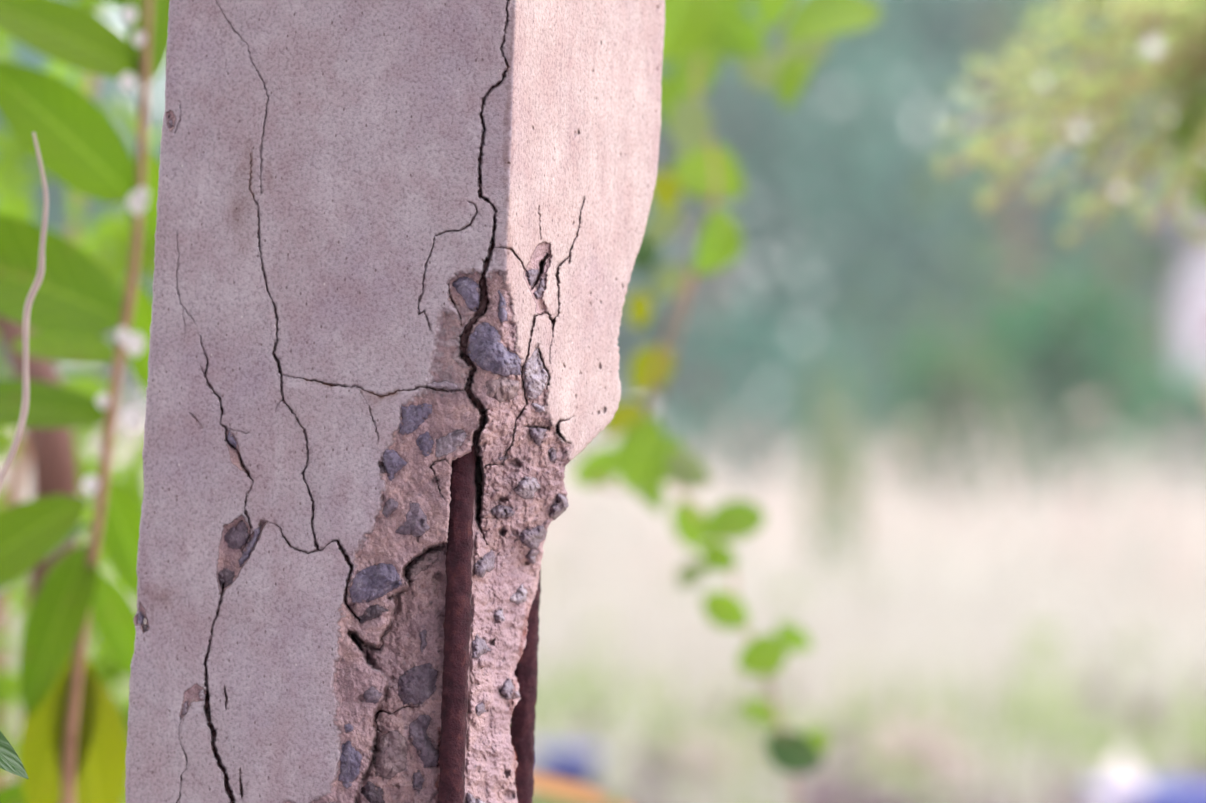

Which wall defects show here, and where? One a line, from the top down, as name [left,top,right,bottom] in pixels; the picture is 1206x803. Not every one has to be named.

crack [424,2,580,532]
spalling [523,242,552,314]
crack [285,456,446,650]
spalling [311,270,571,803]
crack [204,584,242,803]